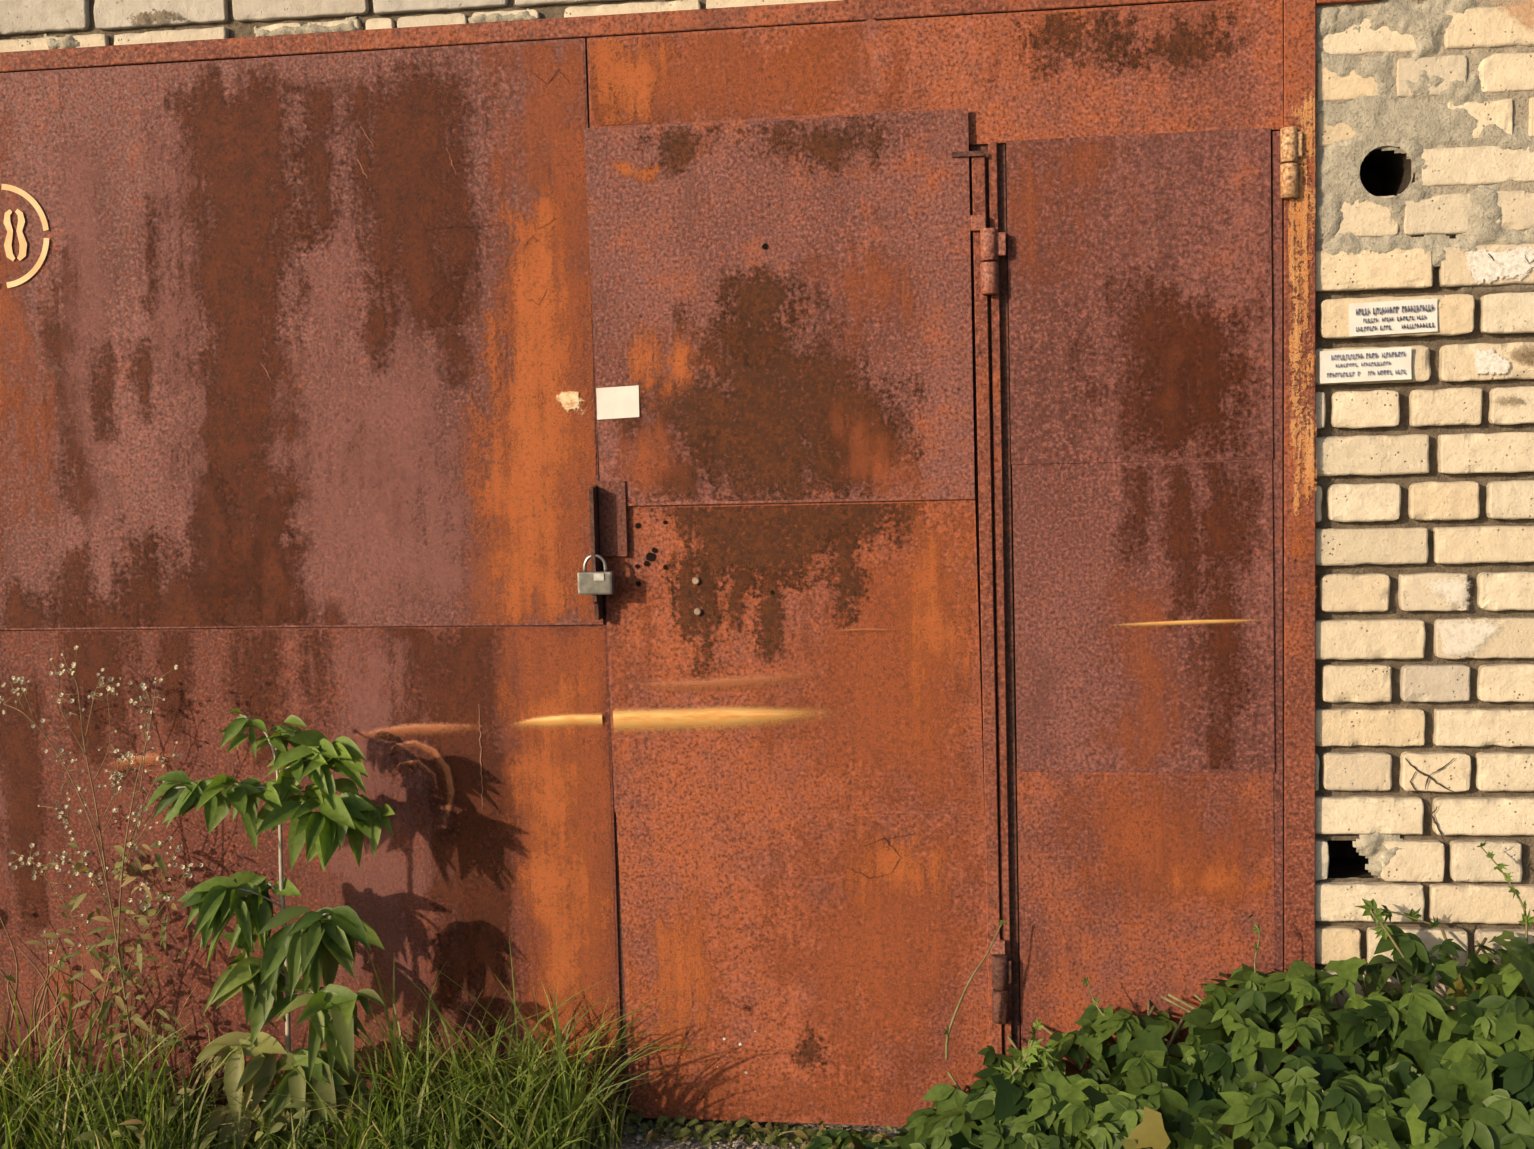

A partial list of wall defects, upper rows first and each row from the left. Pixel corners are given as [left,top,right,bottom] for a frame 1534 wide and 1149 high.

peeling [1316,4,1341,39]
peeling [1407,24,1444,62]
spalling [1360,147,1415,196]
corrosion [1071,267,1265,770]
corrosion [0,24,924,1126]
spalling [1328,832,1405,878]